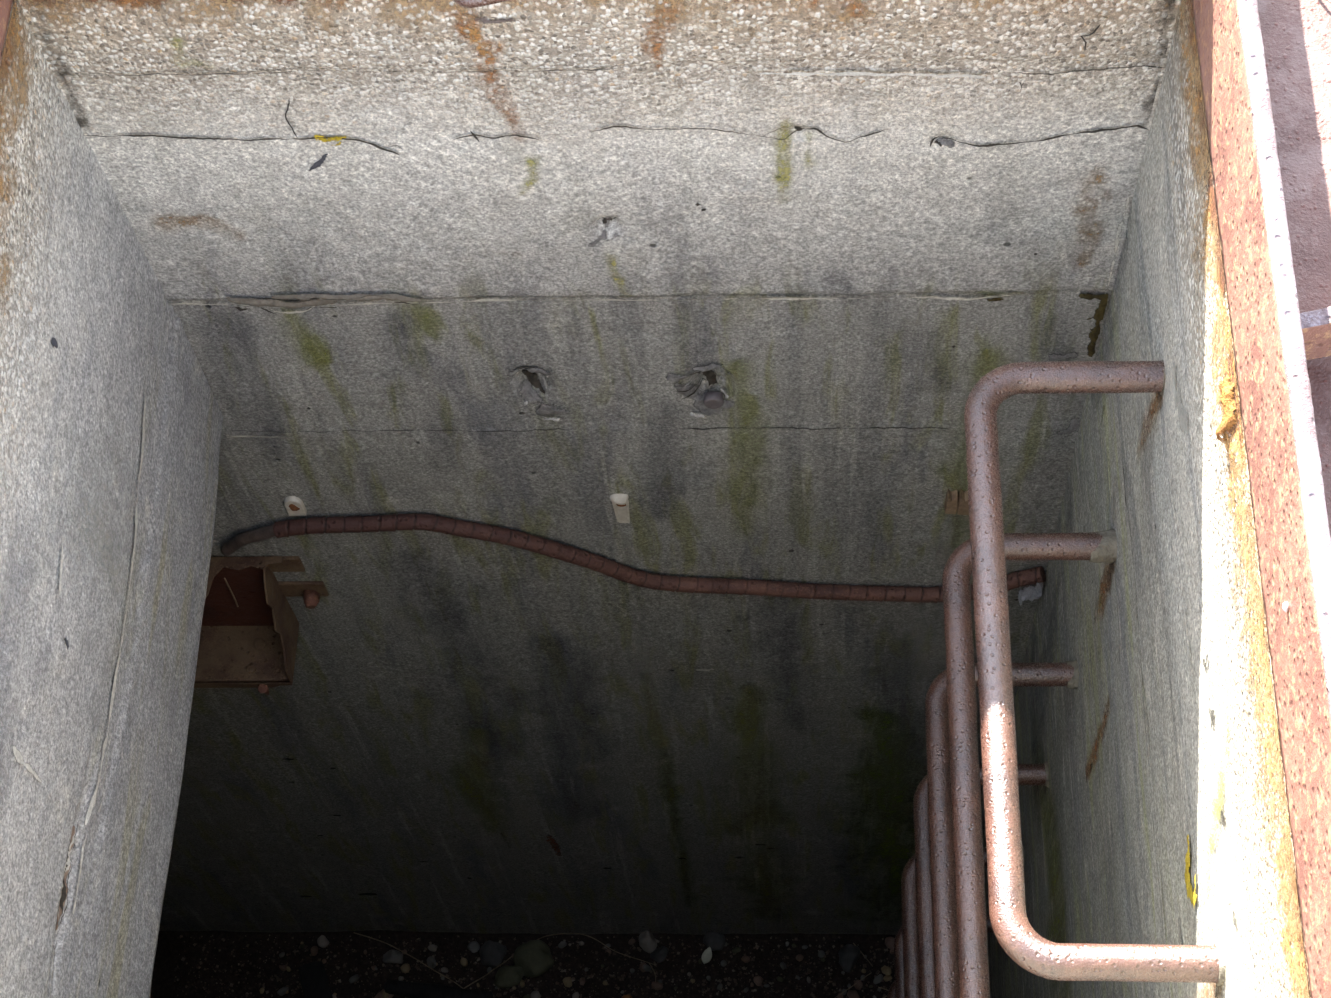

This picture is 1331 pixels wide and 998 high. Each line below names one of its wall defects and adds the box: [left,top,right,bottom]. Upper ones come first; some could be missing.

rust [0,0,166,147]
rust [382,0,525,123]
crack [532,65,622,73]
rust [629,0,712,67]
crack [73,70,486,155]
crack [453,131,539,142]
crack [930,125,1148,147]
spalling [588,217,619,247]
spalling [508,368,570,422]
spalling [666,363,734,419]
rust [1141,393,1162,446]
rust [1175,0,1310,998]